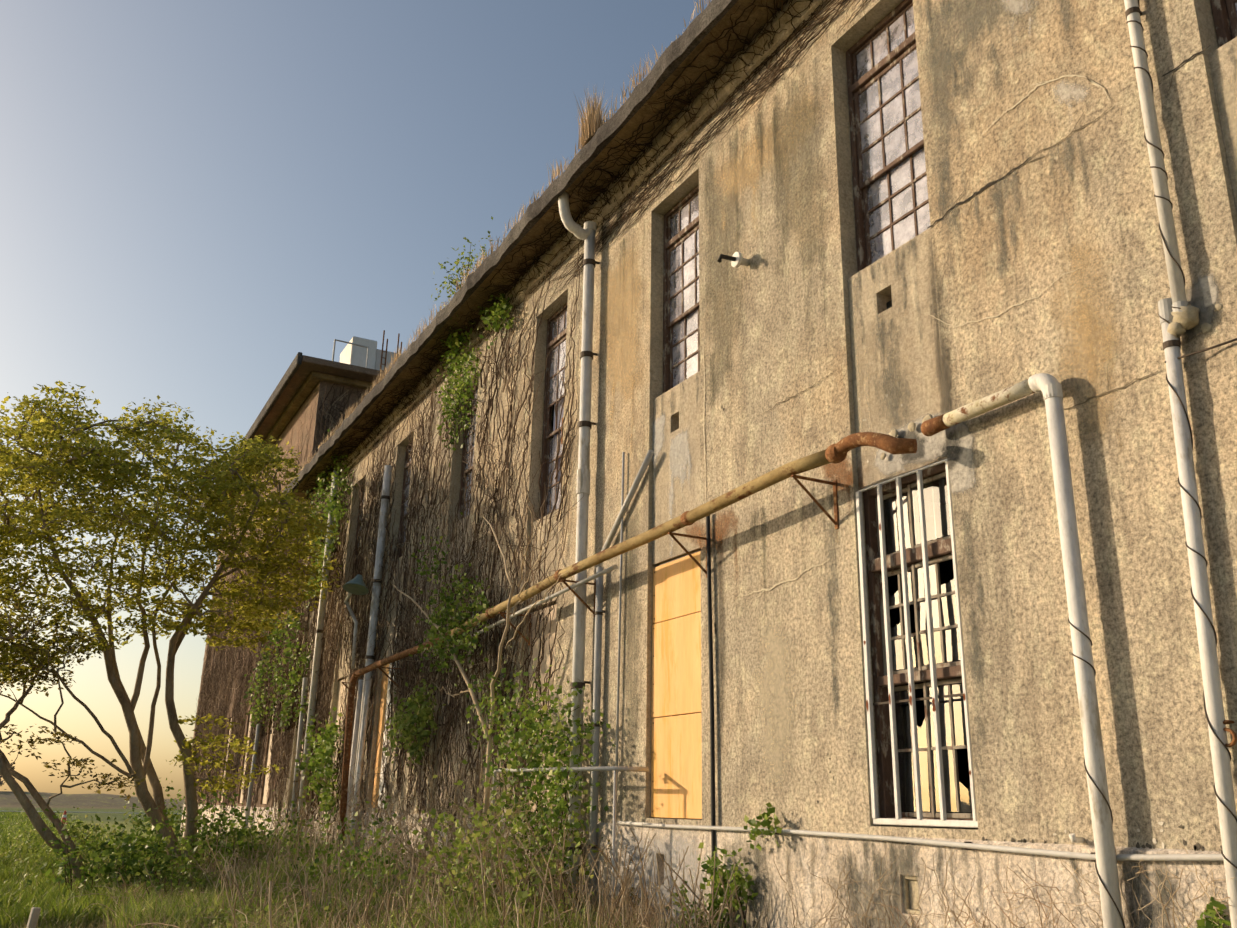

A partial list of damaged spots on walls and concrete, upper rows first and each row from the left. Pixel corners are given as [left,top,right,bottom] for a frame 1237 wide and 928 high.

leakage [925,0,1031,227]
crack [927,75,1112,229]
leakage [840,844,911,928]
leakage [1118,861,1174,928]